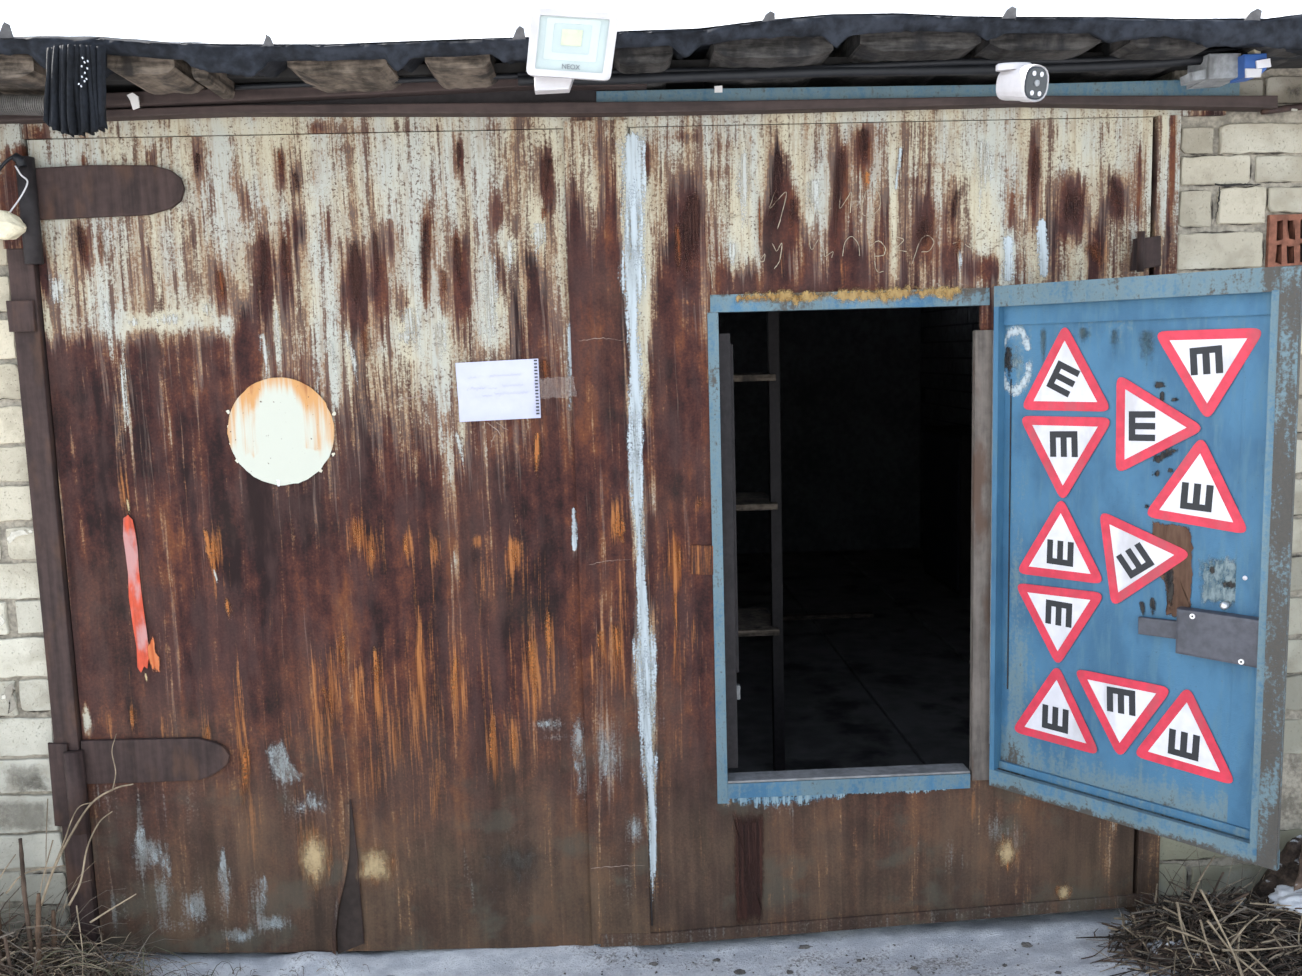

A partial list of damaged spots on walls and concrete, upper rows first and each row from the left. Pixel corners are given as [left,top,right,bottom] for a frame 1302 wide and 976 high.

rust [758,153,797,246]
rust [833,129,870,237]
rust [1032,148,1040,200]
rust [75,226,105,255]
rust [257,235,289,313]
rust [349,232,379,309]
rust [419,218,462,291]
rust [736,285,961,306]
rust [203,530,218,581]
rust [528,612,551,695]
peeling [303,835,331,881]
peeling [362,853,395,879]